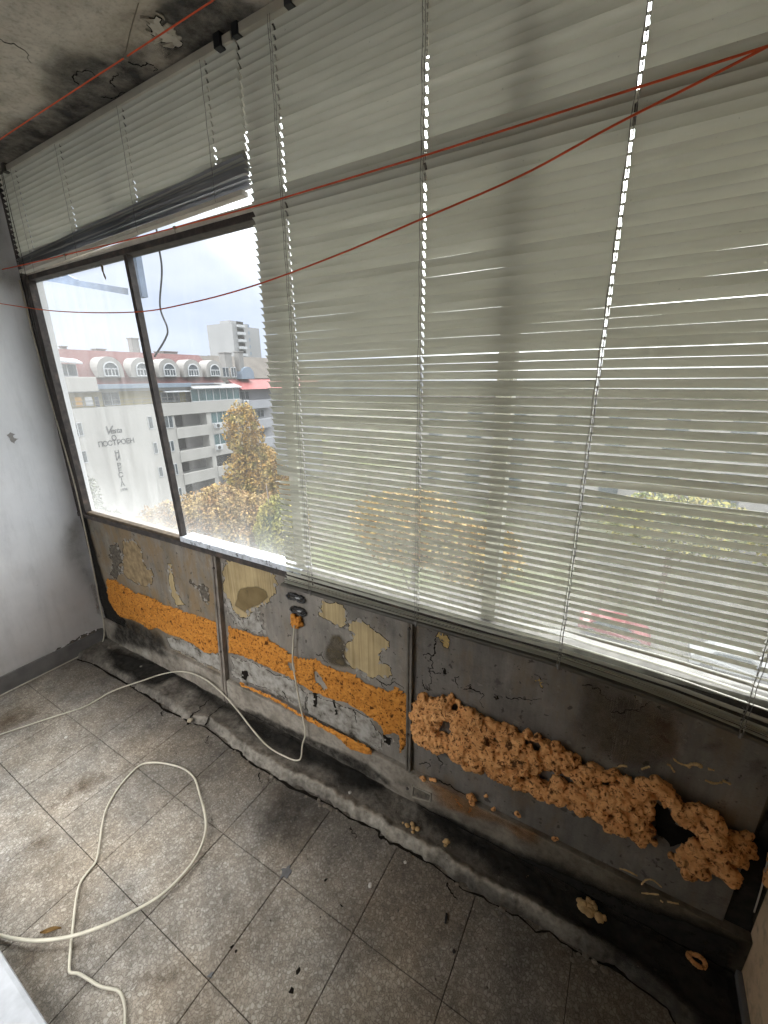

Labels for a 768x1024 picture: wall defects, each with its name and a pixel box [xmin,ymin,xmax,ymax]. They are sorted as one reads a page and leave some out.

spalling [140,0,253,58]
water stain [0,53,148,173]
peeling [109,538,154,587]
peeling [167,563,185,607]
peeling [222,560,278,635]
water stain [80,517,389,790]
peeling [167,637,395,750]
peeling [317,598,392,681]
crack [376,638,537,707]
crack [77,659,676,1024]